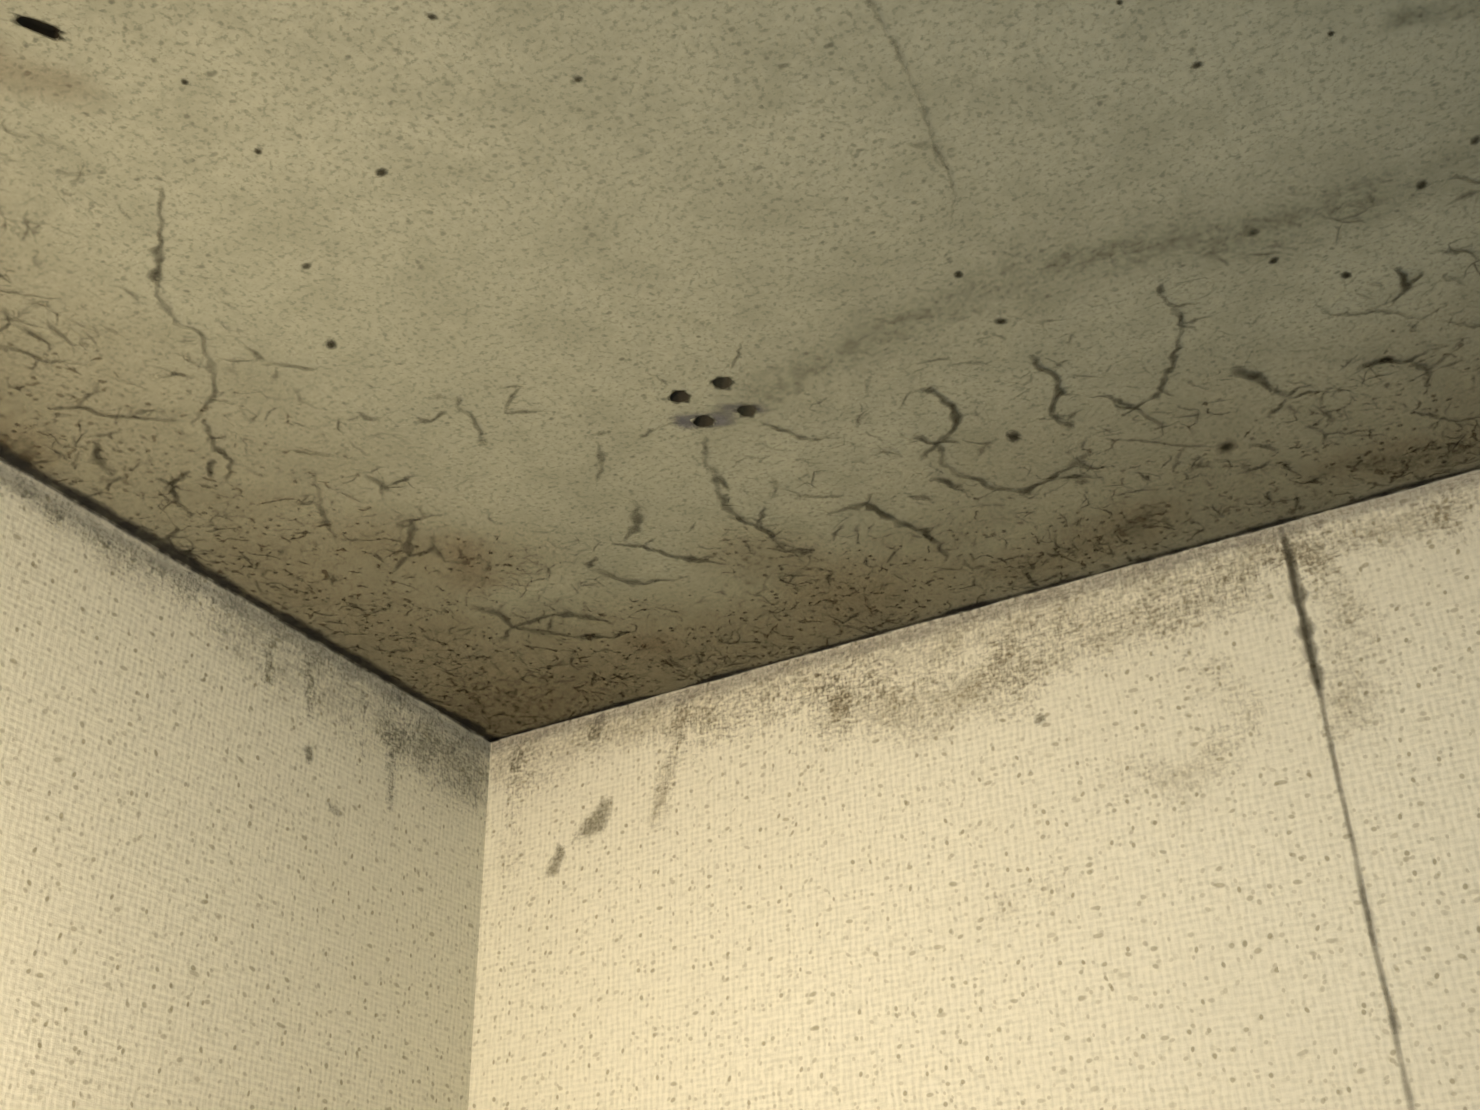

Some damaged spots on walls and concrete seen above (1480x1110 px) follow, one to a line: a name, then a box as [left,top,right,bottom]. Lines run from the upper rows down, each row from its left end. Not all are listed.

crack [151,237,162,281]
crack [1393,272,1421,301]
crack [1034,361,1069,425]
crack [1101,347,1180,412]
crack [1242,372,1330,417]
crack [1370,358,1455,375]
leakage [0,330,1480,734]
crack [0,389,1480,743]